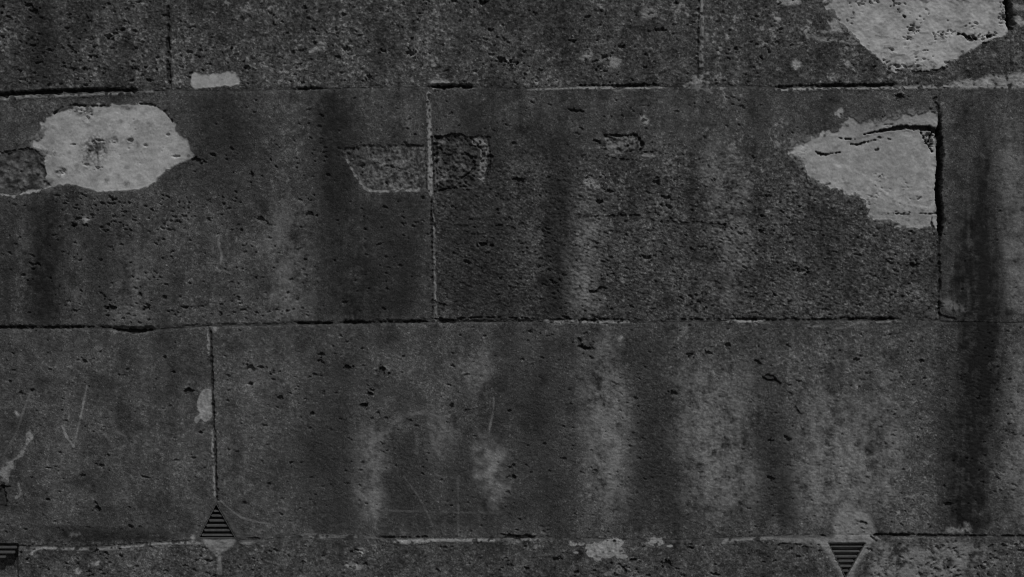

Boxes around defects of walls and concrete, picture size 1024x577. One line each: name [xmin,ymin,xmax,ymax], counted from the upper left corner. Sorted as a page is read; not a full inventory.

spalling [337,133,492,195]
water stain [947,152,1012,533]